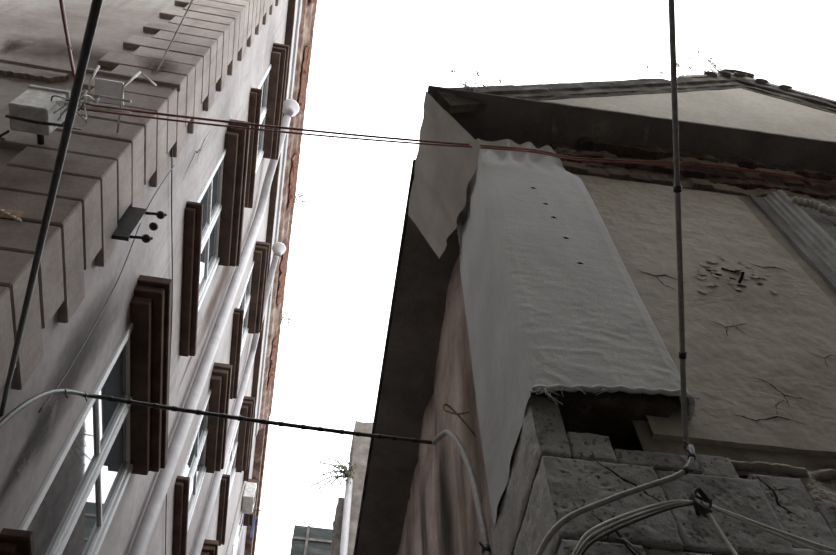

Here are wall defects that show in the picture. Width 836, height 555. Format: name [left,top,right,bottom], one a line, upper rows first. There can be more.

spalling [796,470,836,514]